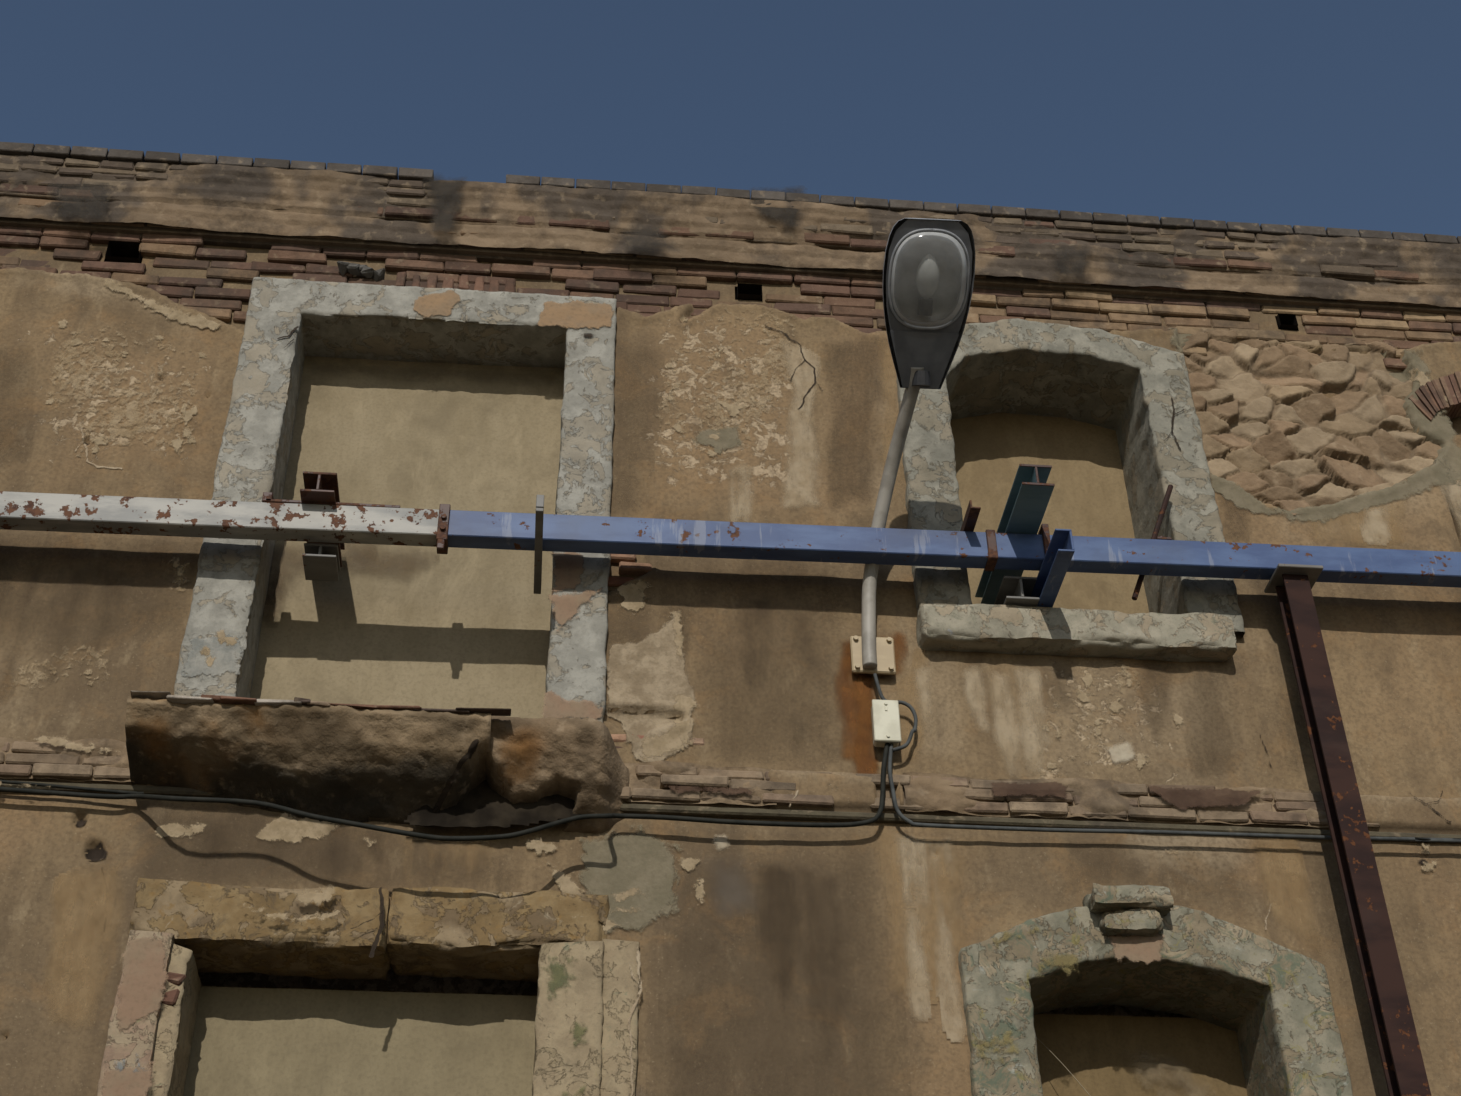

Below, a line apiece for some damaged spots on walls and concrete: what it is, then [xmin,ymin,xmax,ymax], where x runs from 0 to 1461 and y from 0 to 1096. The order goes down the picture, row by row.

flaking render [0,226,886,457]
crack [765,325,823,409]
flaking render [966,288,1461,515]
peeling [548,552,652,631]
flaking render [542,611,834,808]
corrosion [838,643,877,774]
corrosion [893,634,905,672]
flaking render [155,823,206,838]
flaking render [256,794,338,843]
water stain [885,837,964,1042]